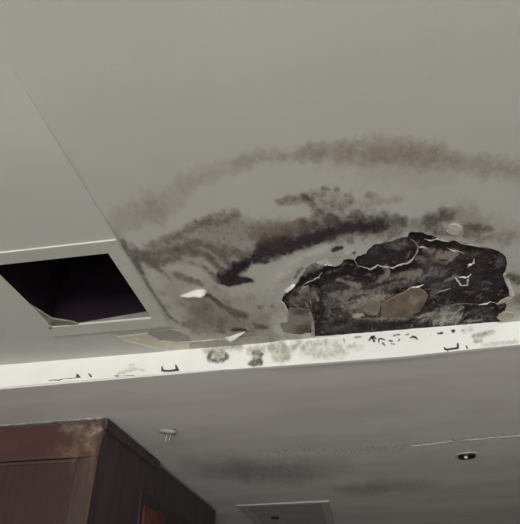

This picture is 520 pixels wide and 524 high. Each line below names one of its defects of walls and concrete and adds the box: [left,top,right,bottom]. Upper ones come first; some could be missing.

mould [425,209,454,235]
leakage [122,213,400,287]
flaking render [280,232,515,336]
peeling [180,289,208,298]
leakage [204,294,236,312]
leakage [217,319,266,333]
peeling [119,329,276,351]
mould [207,346,229,362]
mould [248,351,263,366]